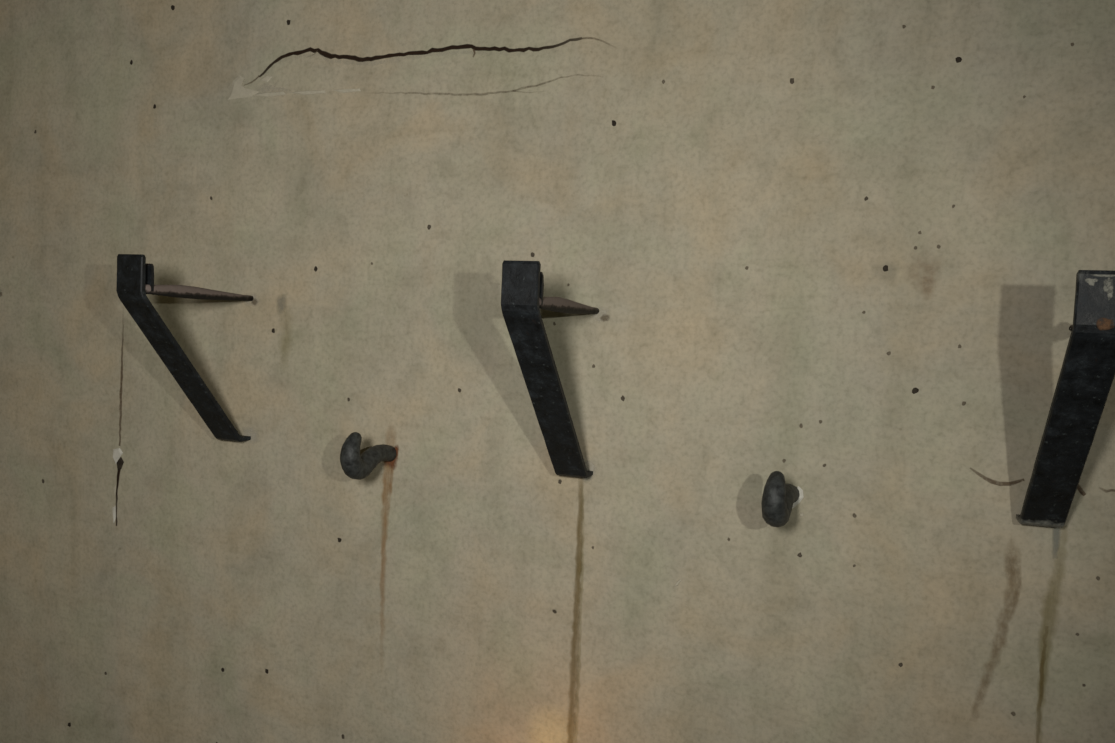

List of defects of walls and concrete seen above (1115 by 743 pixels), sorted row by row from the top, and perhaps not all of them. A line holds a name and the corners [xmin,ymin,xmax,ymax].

crack [253,37,593,81]